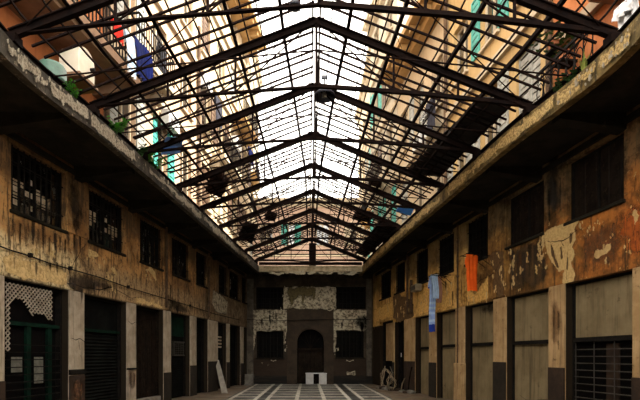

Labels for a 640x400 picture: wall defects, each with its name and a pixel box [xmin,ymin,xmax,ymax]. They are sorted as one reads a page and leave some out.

spalling [7,39,136,161]
leakage [31,181,82,253]
peeling [537,220,600,284]
peeling [594,233,613,264]
corrosion [582,207,640,270]
leakage [68,275,112,301]
peeling [253,286,429,355]